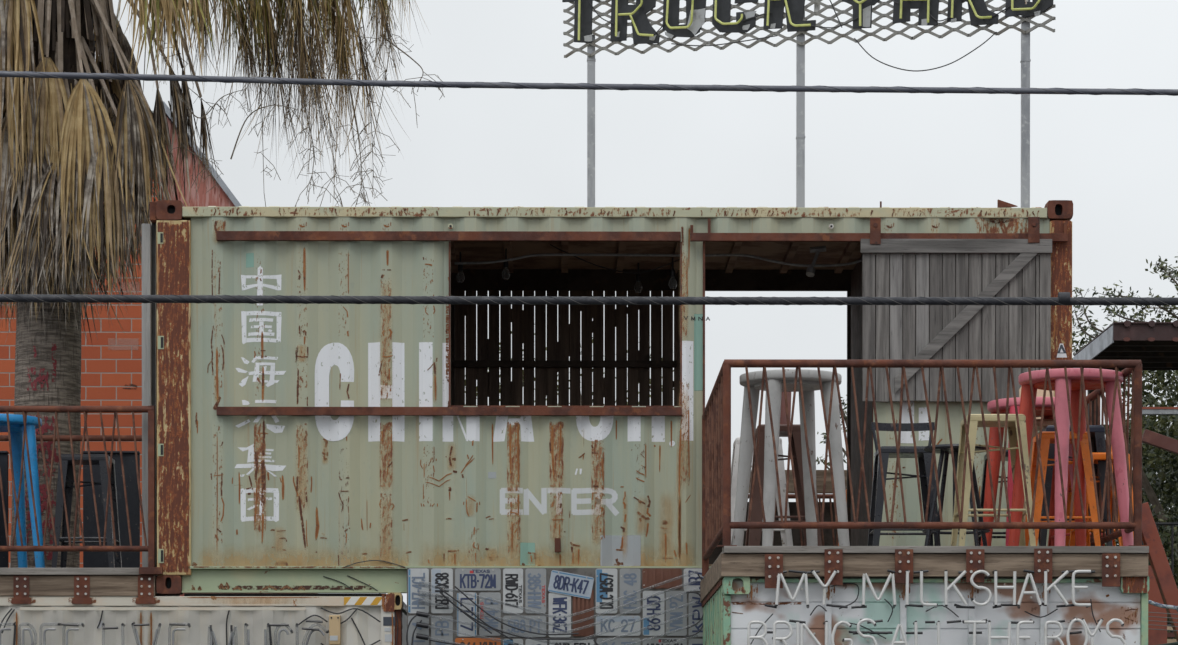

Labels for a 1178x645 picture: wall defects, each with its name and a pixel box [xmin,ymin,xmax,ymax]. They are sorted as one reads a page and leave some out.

rust [378,250,393,400]
rust [192,420,411,568]
rust [420,383,691,566]
rust [188,582,372,598]